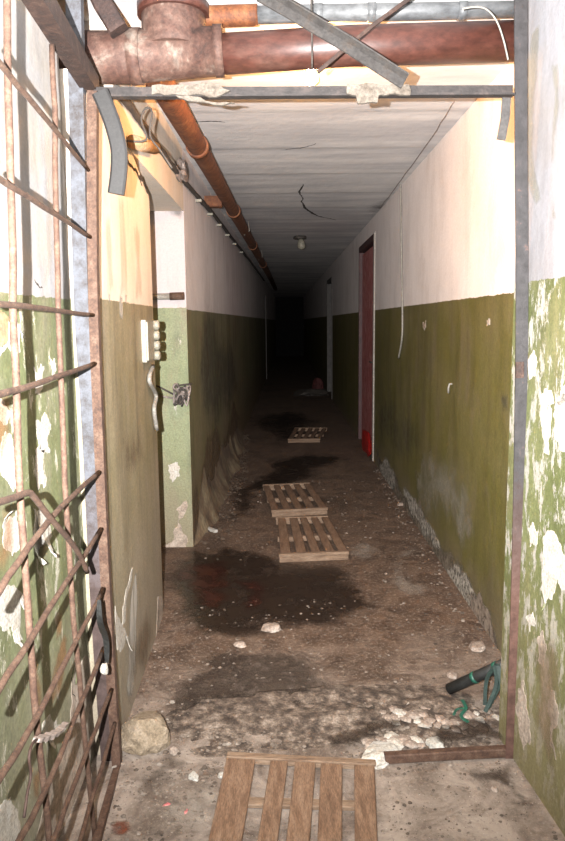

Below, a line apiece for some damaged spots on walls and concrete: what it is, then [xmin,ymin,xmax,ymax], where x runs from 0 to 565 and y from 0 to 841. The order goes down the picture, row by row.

crack [298,184,334,220]
peeling [528,350,538,380]
peeling [0,398,16,492]
peeling [34,412,51,490]
peeling [540,385,565,455]
peeling [33,508,57,566]
spalling [163,501,188,547]
peeling [0,585,24,647]
peeling [114,567,133,652]
water stain [175,548,370,636]
peeling [35,655,95,841]
peeling [0,796,21,841]